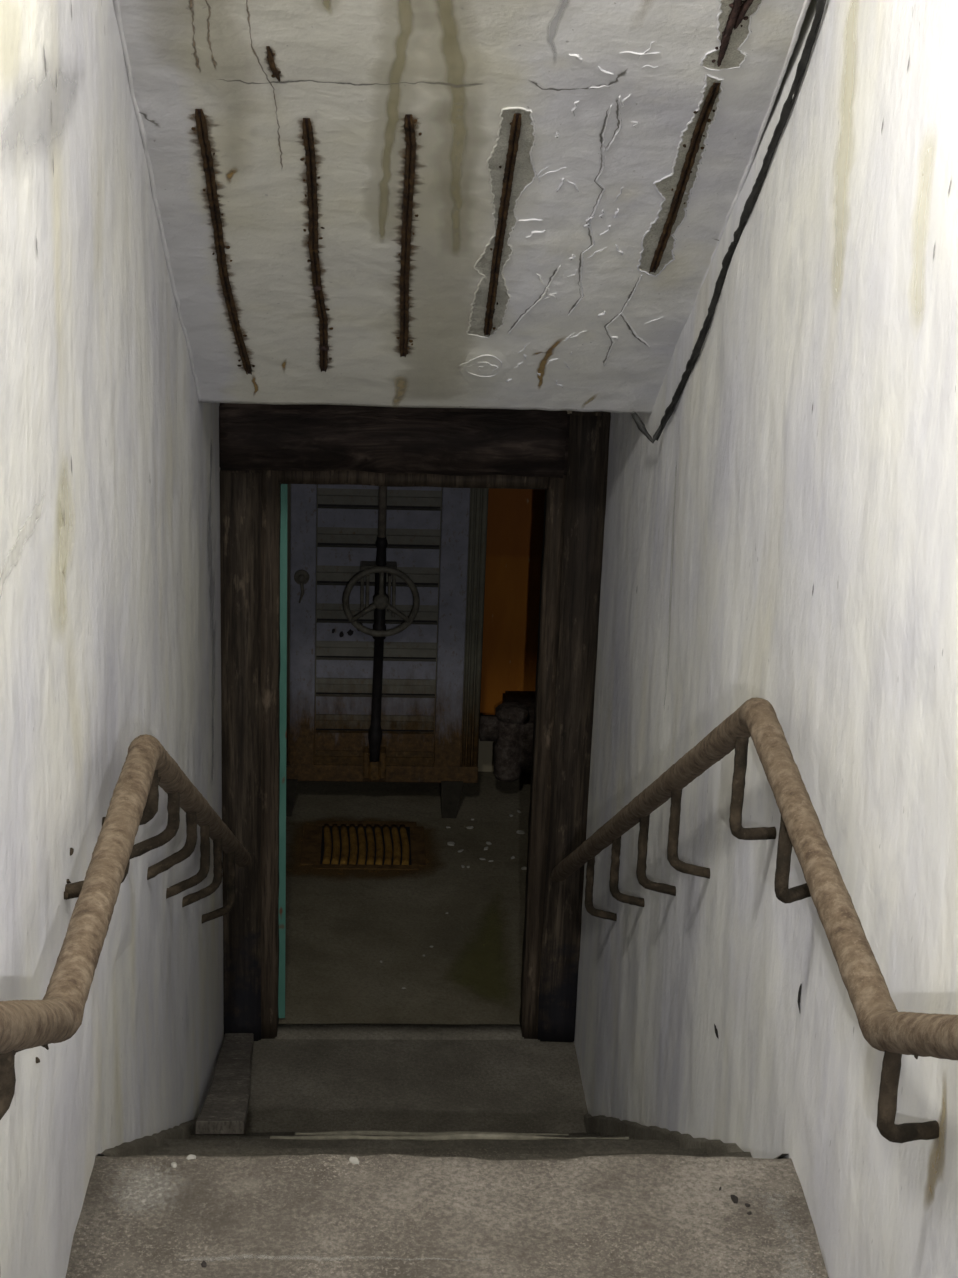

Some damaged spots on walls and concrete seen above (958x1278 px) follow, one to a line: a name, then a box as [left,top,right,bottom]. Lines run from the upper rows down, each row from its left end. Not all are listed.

crack [189,0,479,167]
damp [379,0,412,237]
damp [438,0,465,251]
spalling [466,107,578,339]
crack [508,71,626,334]
peeling [567,187,623,277]
crack [603,274,651,366]
peeling [619,41,660,68]
spalling [637,0,763,277]
corrosion [929,1100,945,1194]